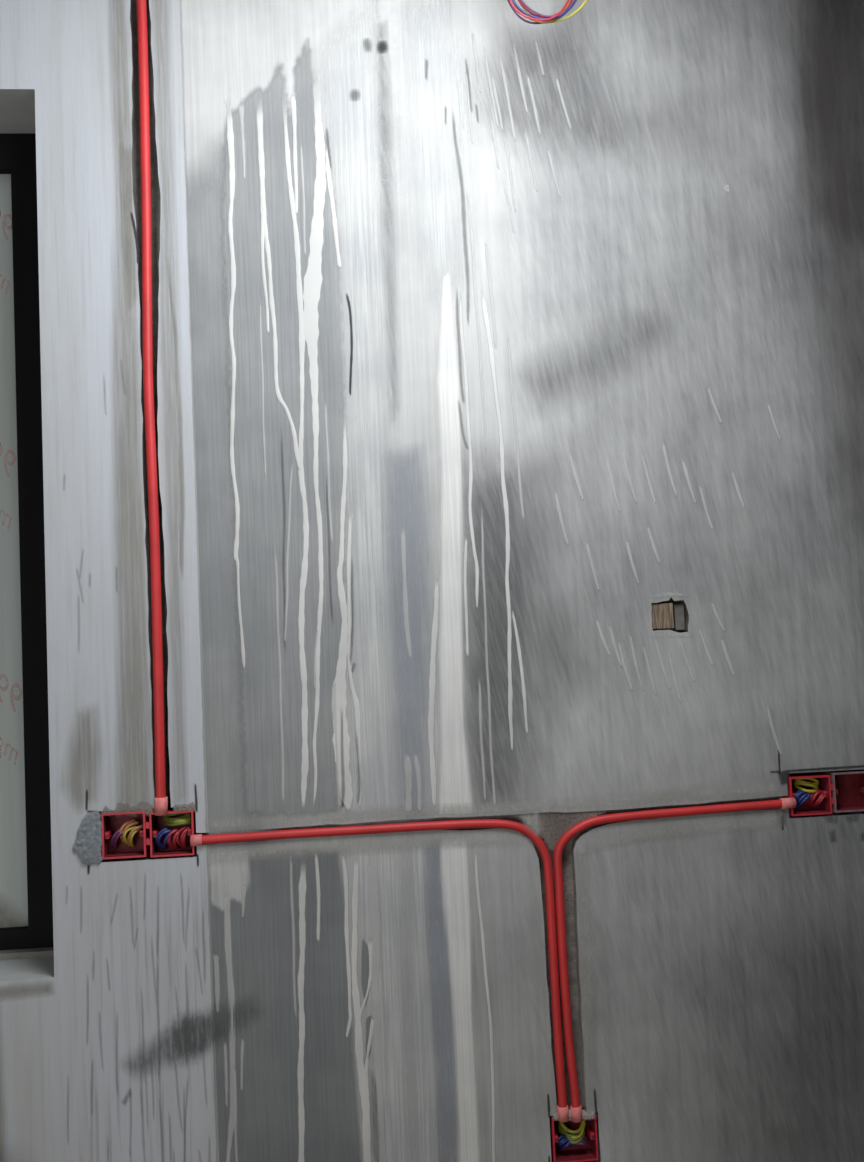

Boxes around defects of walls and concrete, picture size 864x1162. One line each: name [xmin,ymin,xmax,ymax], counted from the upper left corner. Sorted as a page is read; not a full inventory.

damp [535,42,571,129]
damp [180,0,540,835]
damp [663,445,713,528]
damp [597,621,695,701]
damp [210,838,495,1162]